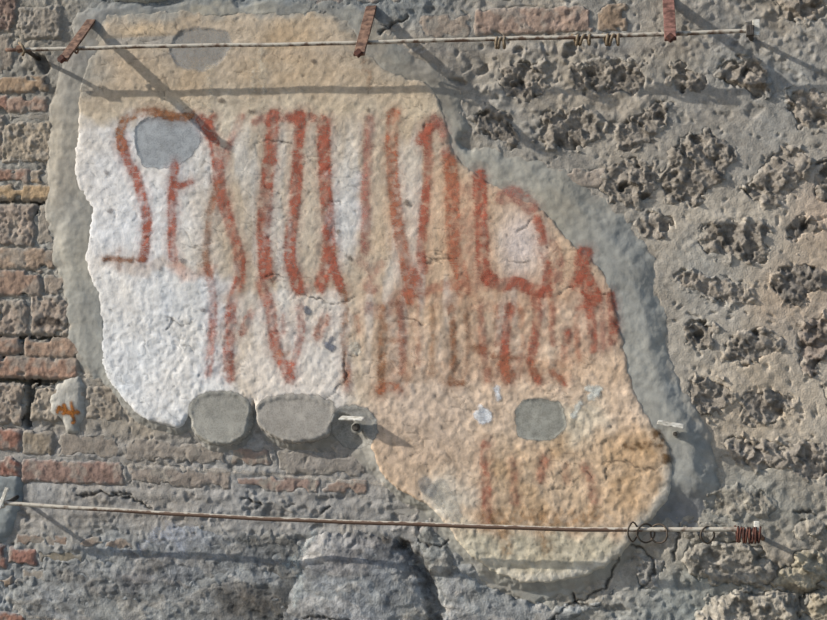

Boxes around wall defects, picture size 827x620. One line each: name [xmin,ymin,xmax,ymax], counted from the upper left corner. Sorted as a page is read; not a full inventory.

spalling [474,405,492,424]